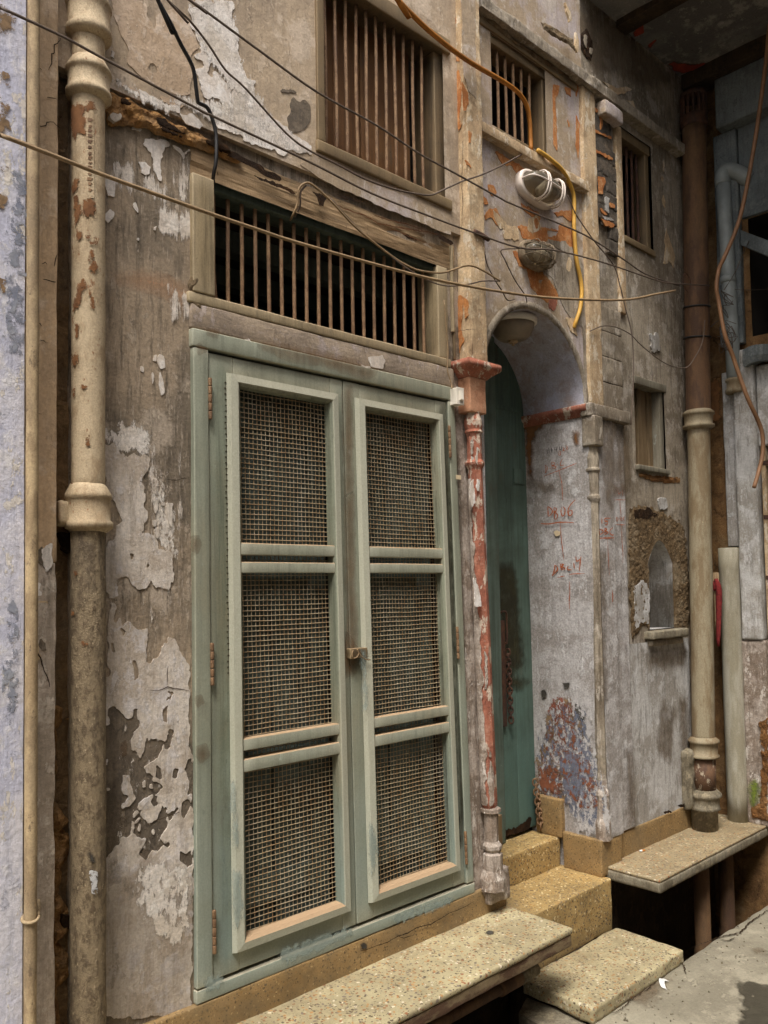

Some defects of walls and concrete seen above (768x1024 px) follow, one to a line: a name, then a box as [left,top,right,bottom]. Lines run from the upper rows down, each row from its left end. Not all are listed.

corrosion [71,101,98,140]
corrosion [72,178,98,338]
peeling [167,276,201,322]
peeling [105,0,451,241]
peeling [495,151,524,173]
peeling [483,184,586,336]
flaking render [595,108,619,258]
flaking render [628,497,690,639]
peeling [105,420,194,1019]
peeling [534,683,613,837]